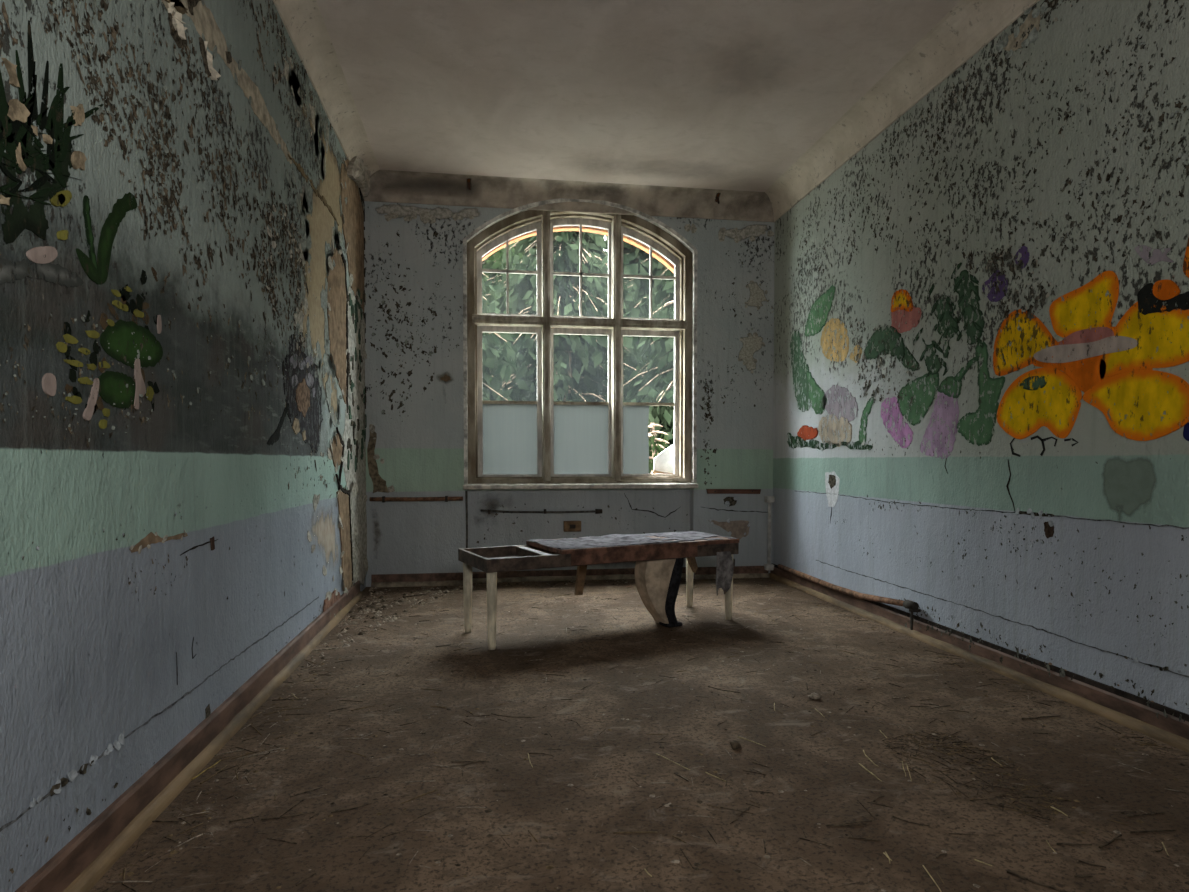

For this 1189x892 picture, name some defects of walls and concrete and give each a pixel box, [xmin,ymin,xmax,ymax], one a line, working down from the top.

peeling [45,0,462,618]
peeling [797,0,1189,323]
crack [0,596,319,832]